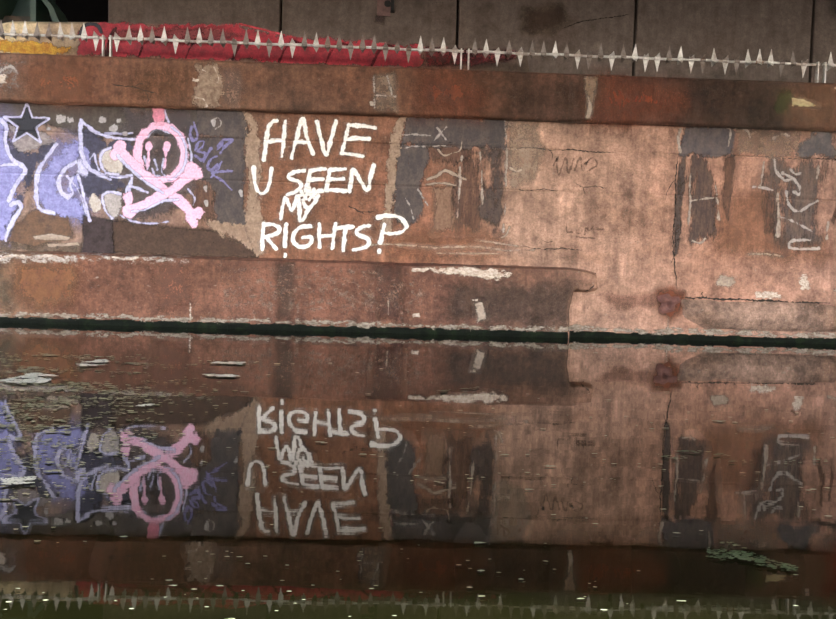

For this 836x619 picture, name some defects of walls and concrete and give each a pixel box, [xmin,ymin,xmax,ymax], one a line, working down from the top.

corrosion [14,261,77,309]
crack [666,156,831,306]